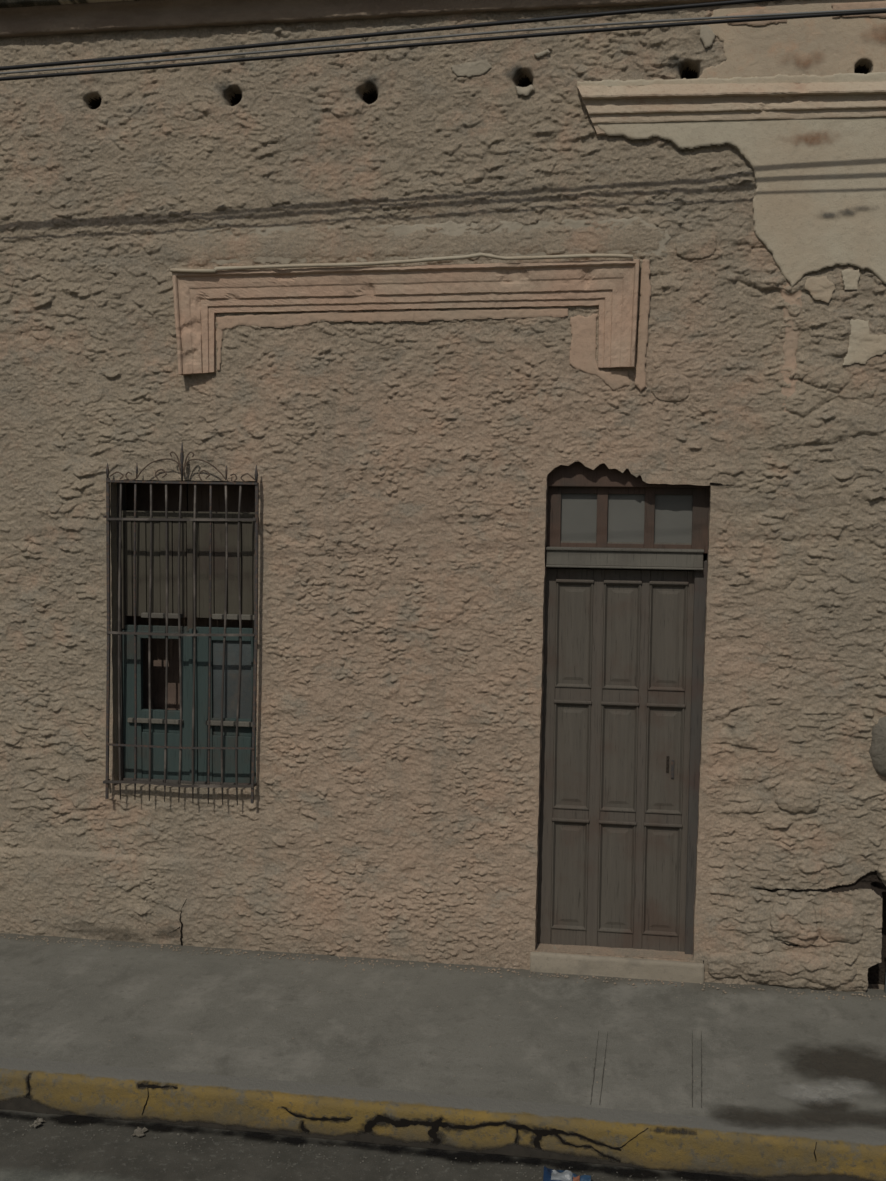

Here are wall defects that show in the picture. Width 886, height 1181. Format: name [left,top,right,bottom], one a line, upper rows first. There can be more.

flaking render [577,0,886,87]
flaking render [596,117,886,414]
spalling [538,448,656,484]
crack [755,885,840,893]
crack [169,899,187,946]
crack [24,1073,32,1099]
crack [137,1081,178,1115]
crack [282,1106,694,1162]